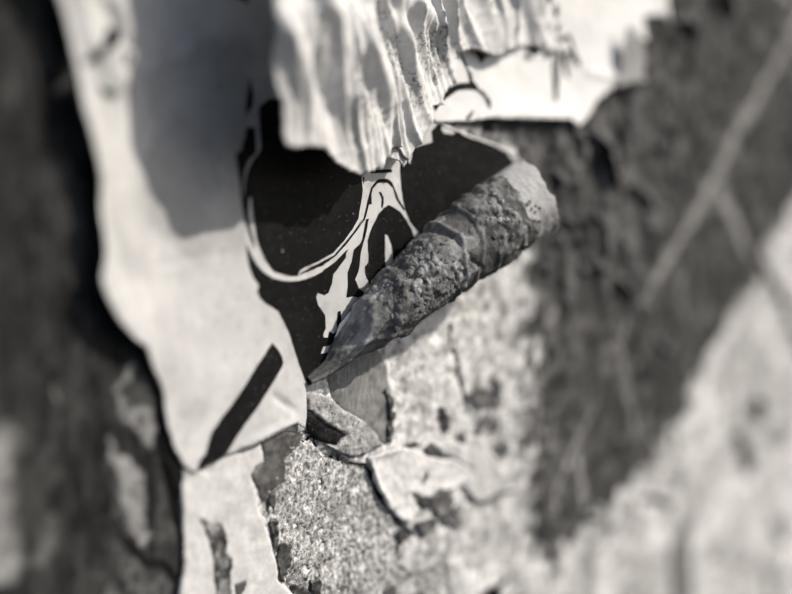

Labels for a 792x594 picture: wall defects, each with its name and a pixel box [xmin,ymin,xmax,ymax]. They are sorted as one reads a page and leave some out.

peeling [485,190,528,248]
flaking render [384,293,503,458]
flaking render [251,430,462,594]
crack [301,436,413,536]
crack [465,489,520,505]
peeling [496,440,511,456]